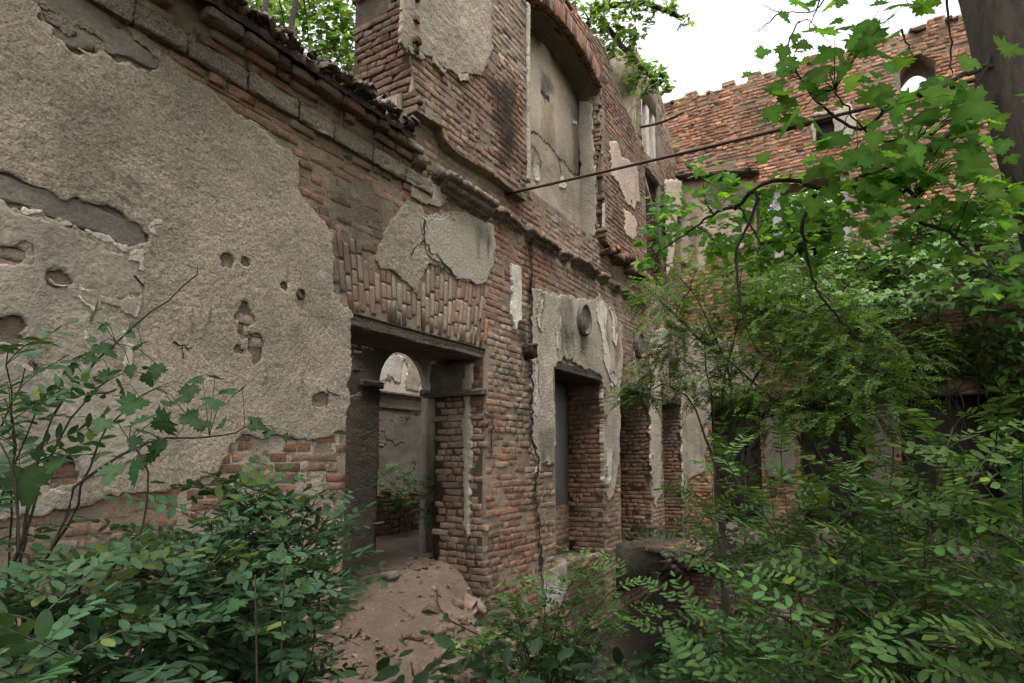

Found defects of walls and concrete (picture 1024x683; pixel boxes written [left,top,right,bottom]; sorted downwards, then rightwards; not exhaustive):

peeling [34,0,160,69]
peeling [0,175,163,271]
crack [410,218,457,278]
peeling [536,291,564,360]
peeling [596,296,619,387]
crack [484,240,545,593]
peeling [534,359,542,417]
peeling [606,447,614,485]
spalling [174,434,344,588]